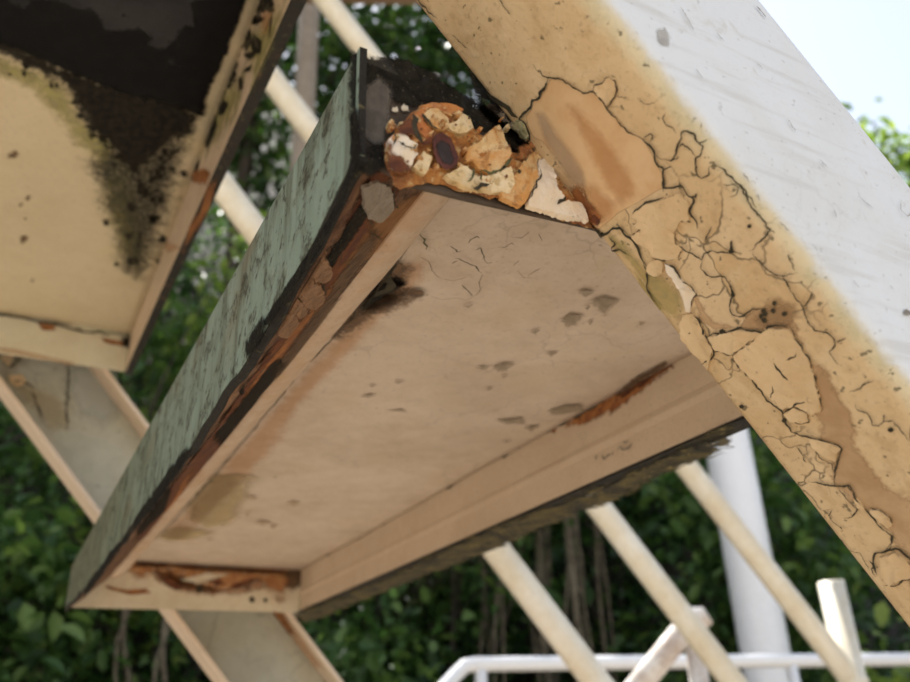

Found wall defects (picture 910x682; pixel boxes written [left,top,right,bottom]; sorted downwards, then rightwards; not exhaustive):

leakage [0,0,280,277]
leakage [244,52,528,357]
crack [488,66,846,366]
leakage [84,447,188,598]
corrosion [106,561,301,636]
corrosion [136,195,380,542]
corrosion [311,250,407,361]
corrosion [547,362,673,433]
crack [770,402,893,571]
crack [849,381,907,439]